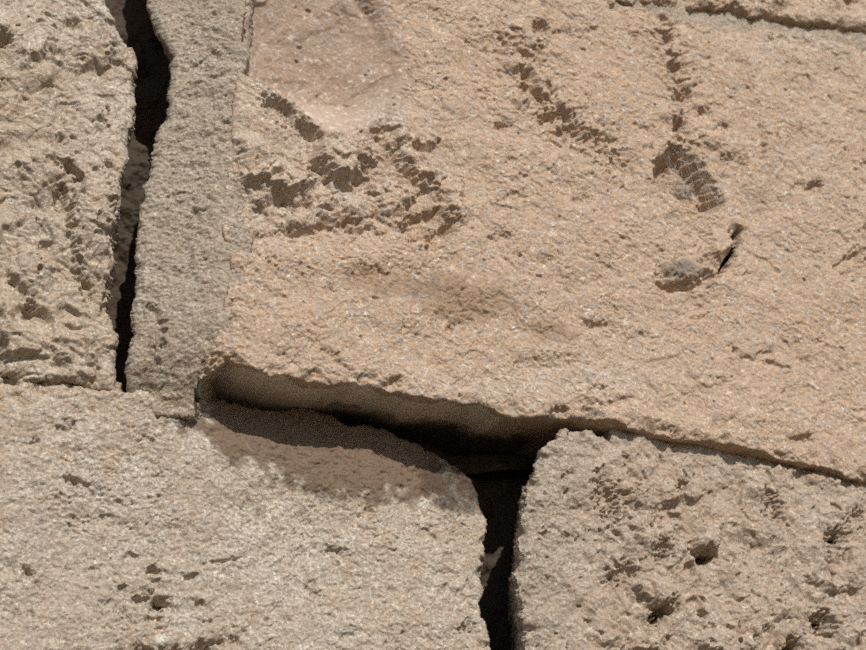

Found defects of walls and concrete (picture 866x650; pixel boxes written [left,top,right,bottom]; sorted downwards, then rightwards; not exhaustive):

crack [493,16,632,172]
crack [654,11,695,148]
crack [105,0,171,393]
crack [680,222,749,295]
crack [195,378,204,403]
crack [415,443,537,650]